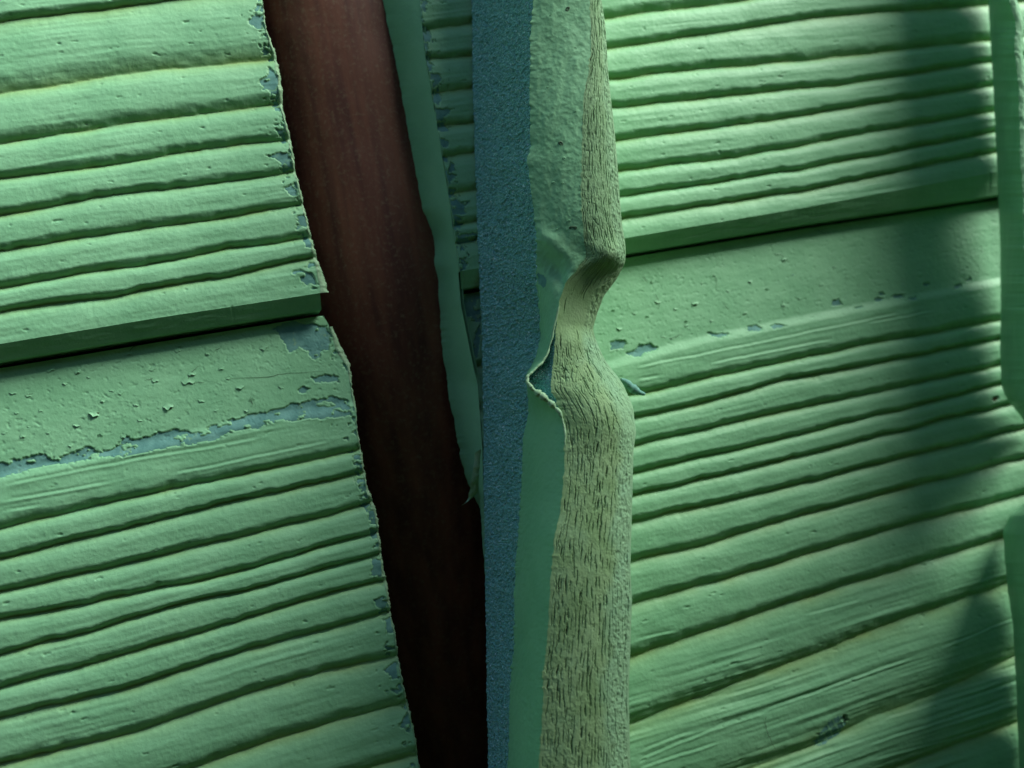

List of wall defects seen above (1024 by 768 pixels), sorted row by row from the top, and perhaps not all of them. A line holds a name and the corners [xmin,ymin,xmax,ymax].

peeling [249,0,280,111]
peeling [268,124,311,248]
peeling [292,263,316,289]
peeling [273,321,336,359]
peeling [610,327,674,357]
peeling [0,364,382,577]